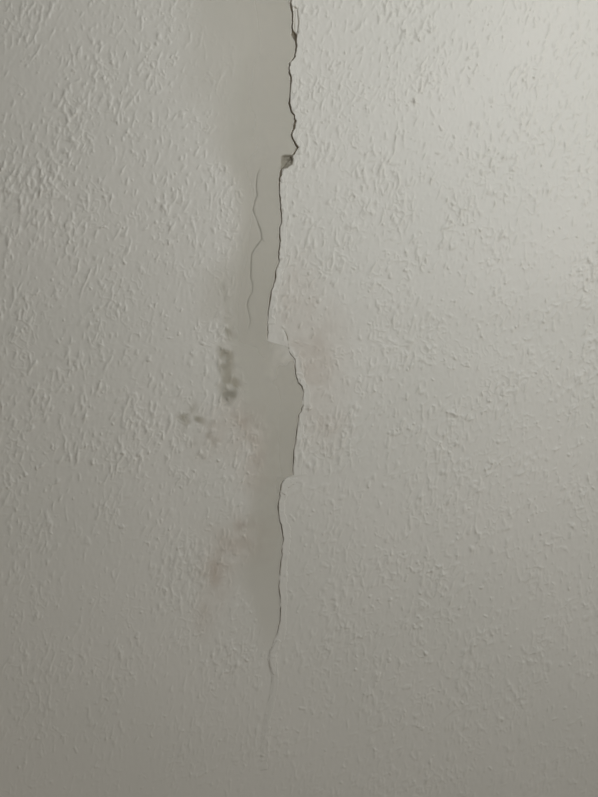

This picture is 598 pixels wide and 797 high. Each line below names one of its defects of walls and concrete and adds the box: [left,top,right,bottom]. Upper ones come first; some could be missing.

crack [245,0,303,632]
peeling [260,0,305,341]
peeling [260,357,311,770]